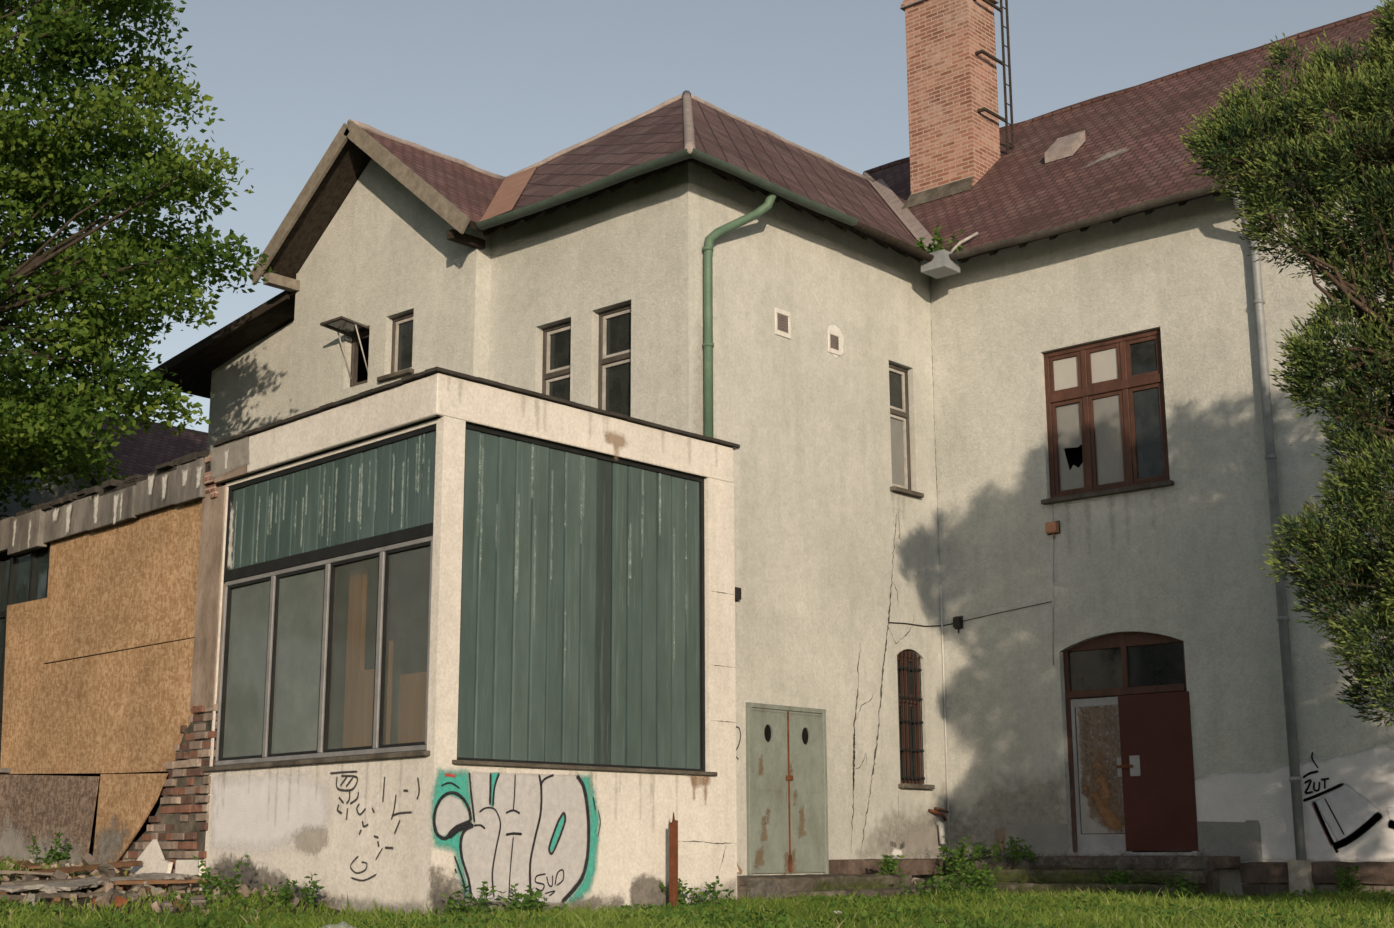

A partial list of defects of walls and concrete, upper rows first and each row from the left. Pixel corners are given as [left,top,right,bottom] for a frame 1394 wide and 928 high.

rust [606,433,625,453]
crack [851,512,914,855]
rust [1077,706,1125,833]
rust [756,810,769,867]